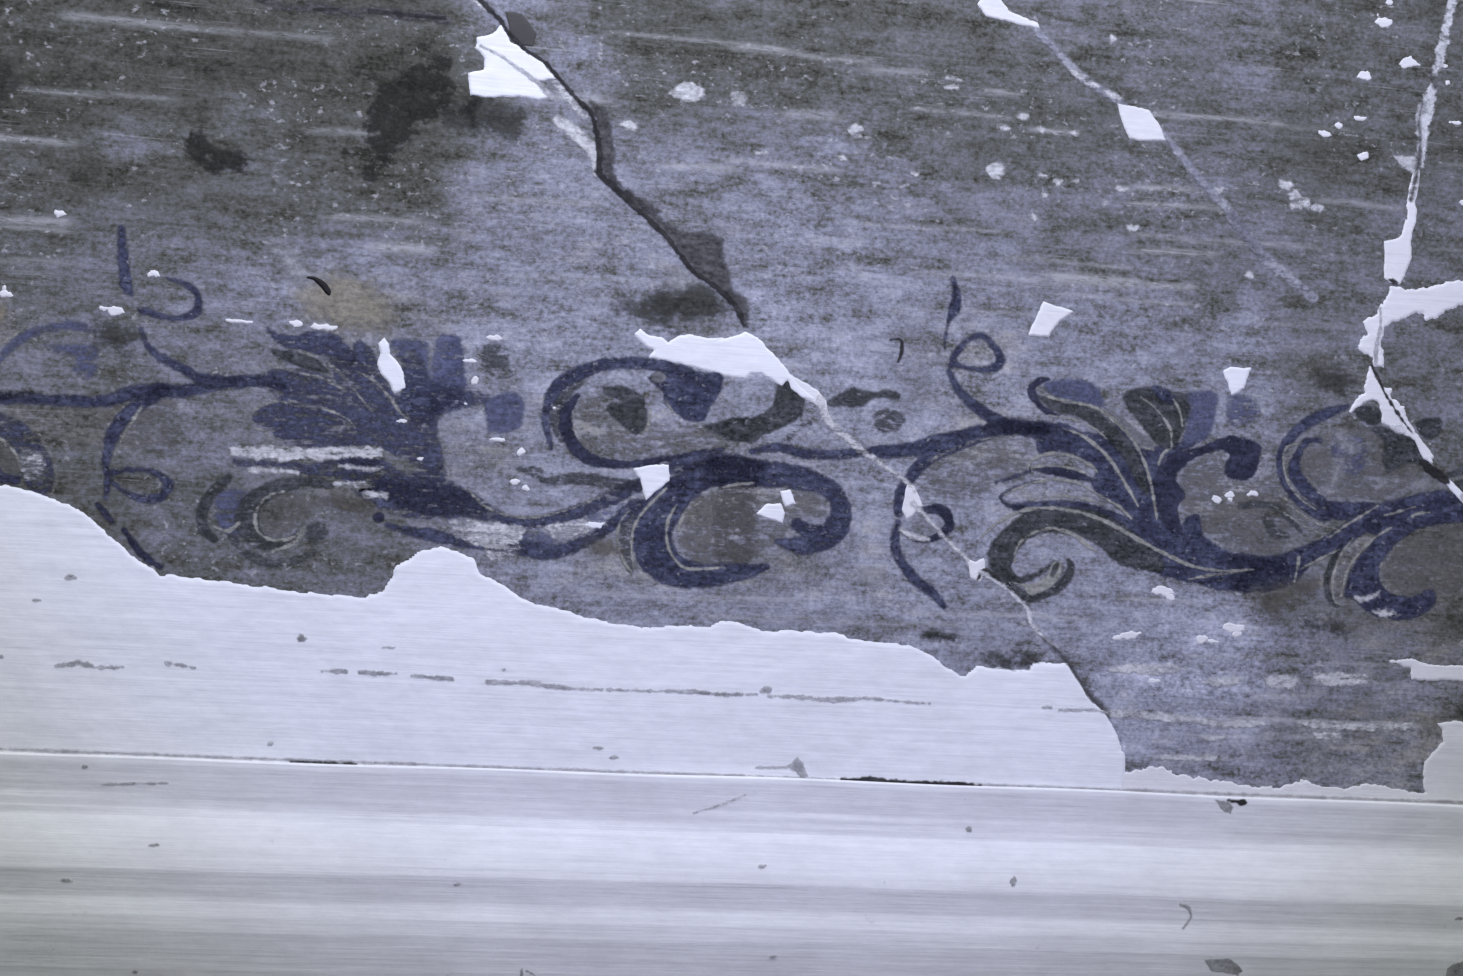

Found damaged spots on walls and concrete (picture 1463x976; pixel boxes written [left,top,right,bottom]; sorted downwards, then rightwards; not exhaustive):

leakage [185,130,247,174]
leakage [362,55,524,182]
crack [259,0,748,326]
peeling [468,25,556,100]
crack [1384,0,1457,284]
peeling [635,329,815,400]
crack [1349,364,1463,503]
crack [787,374,1109,718]
crack [55,660,119,670]
crack [165,661,196,669]
crack [321,669,930,704]
peeling [0,454,1463,805]